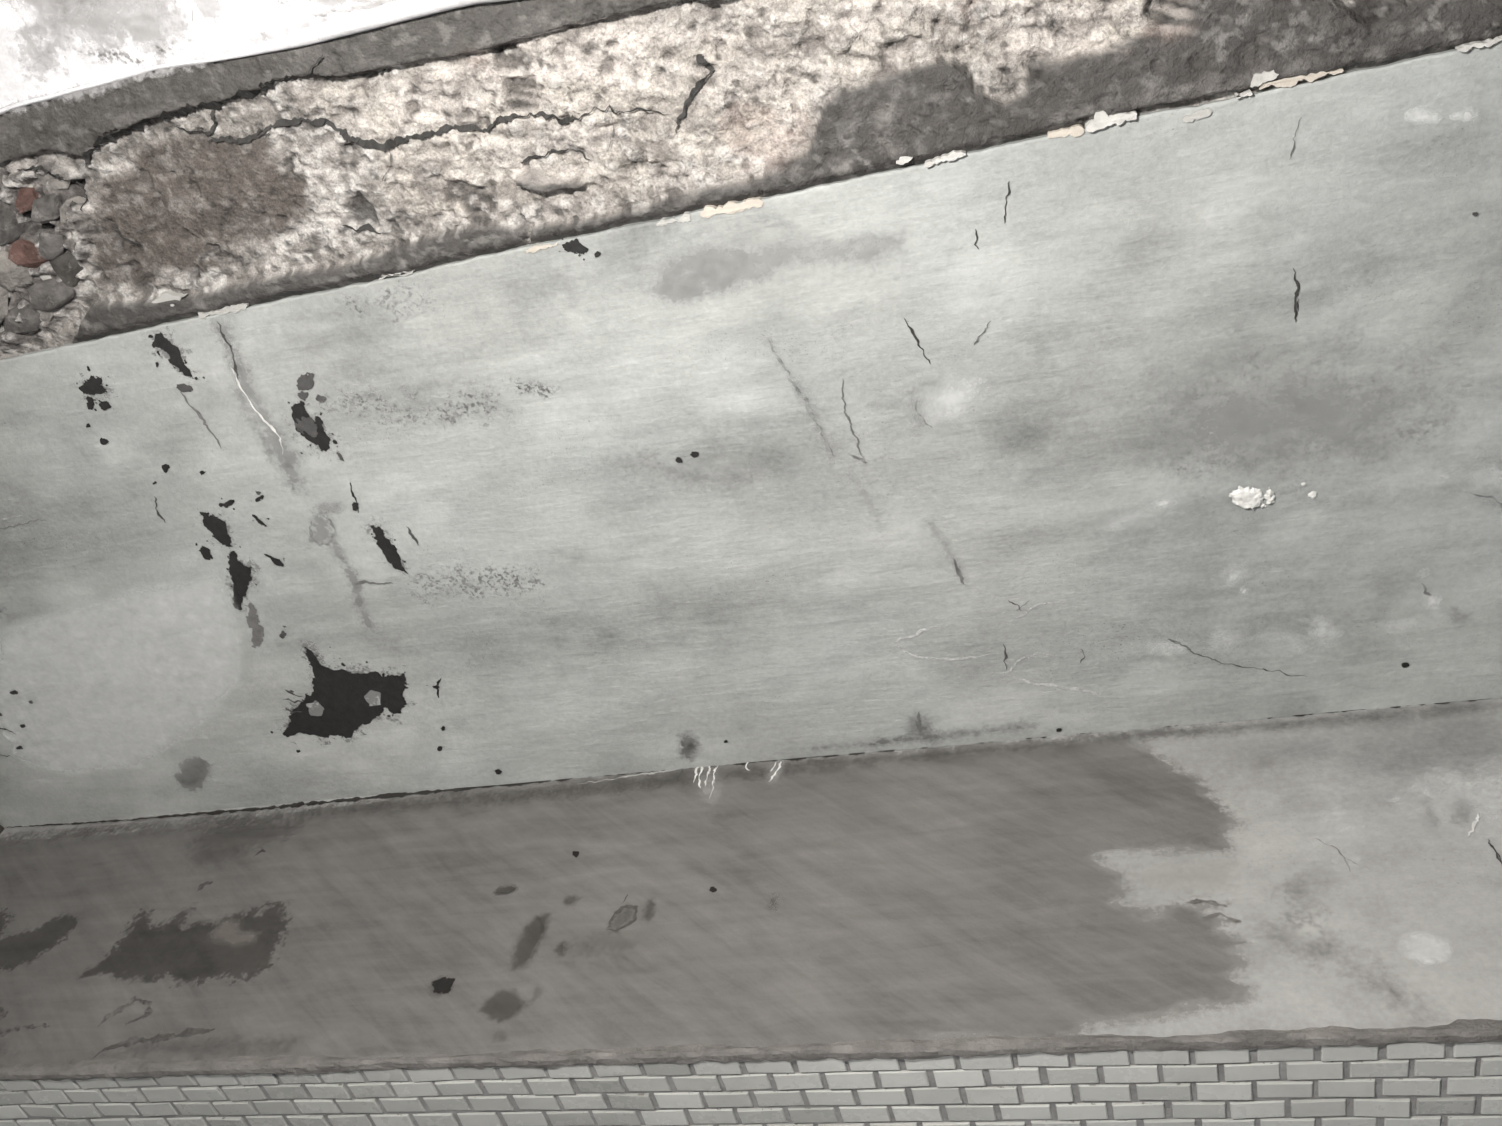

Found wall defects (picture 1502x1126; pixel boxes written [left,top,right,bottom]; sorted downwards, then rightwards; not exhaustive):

crack [0,54,714,245]
spalling [0,0,1502,461]
crack [1292,268,1300,322]
peeling [152,464,170,523]
peeling [196,498,286,648]
peeling [252,491,269,527]
peeling [350,483,544,603]
peeling [270,641,442,753]
crack [1168,639,1310,677]
crack [7,698,1492,839]
leakage [0,712,1250,1064]
crack [1468,813,1502,864]